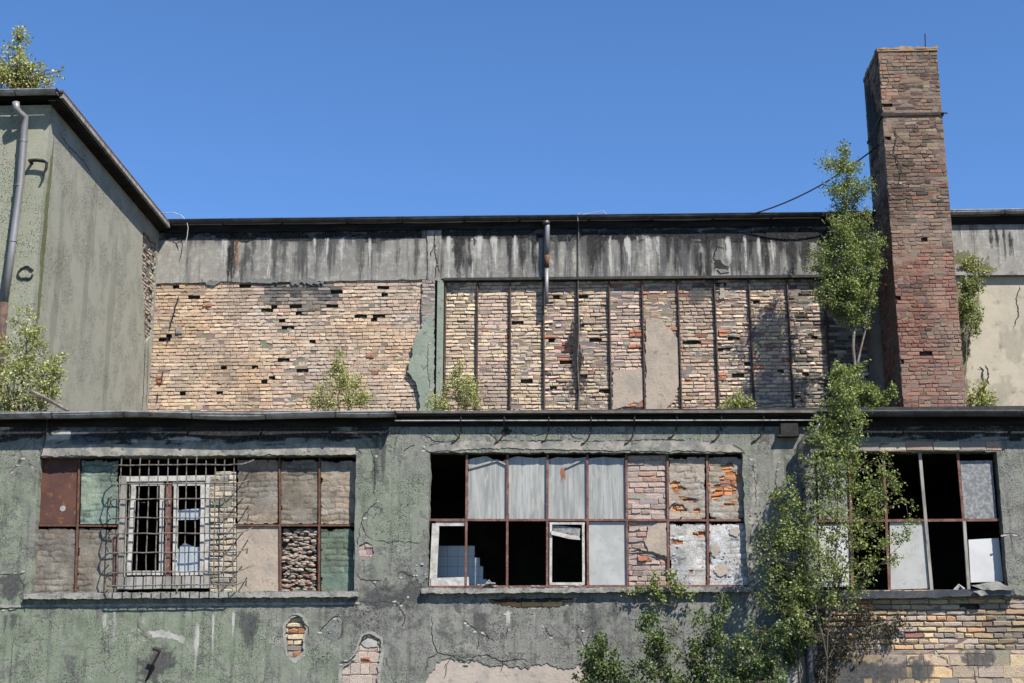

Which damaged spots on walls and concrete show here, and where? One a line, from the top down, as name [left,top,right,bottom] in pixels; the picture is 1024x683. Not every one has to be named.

leakage [221,234,256,281]
leakage [267,238,343,275]
leakage [446,236,538,276]
leakage [552,233,631,273]
leakage [645,234,810,281]
peeling [407,314,435,411]
crack [345,440,418,546]
spalling [283,613,309,663]
spalling [338,631,384,683]
crack [426,613,529,676]
peeling [426,658,589,683]
spalling [786,590,1024,683]